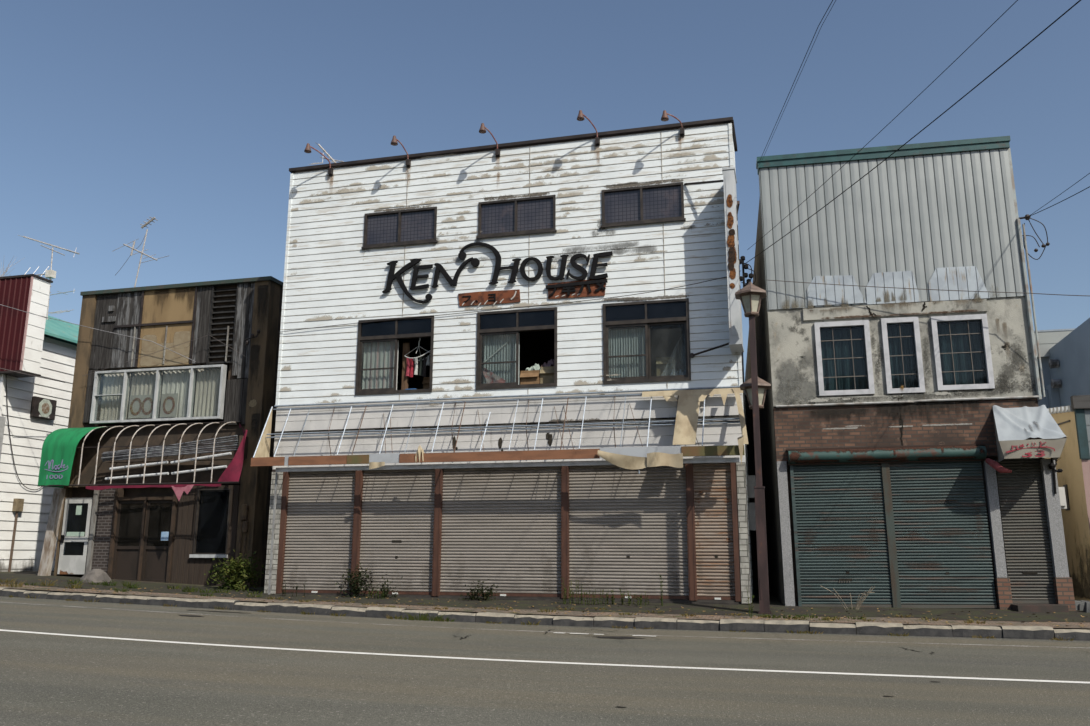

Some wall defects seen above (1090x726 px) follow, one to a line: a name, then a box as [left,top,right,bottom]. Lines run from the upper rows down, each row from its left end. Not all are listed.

peeling [604,138,729,187]
peeling [291,143,646,238]
peeling [685,189,724,210]
peeling [426,211,482,263]
peeling [456,300,573,331]
peeling [419,378,490,405]
peeling [557,374,620,395]
leakage [777,356,979,431]
corrosion [789,446,985,463]